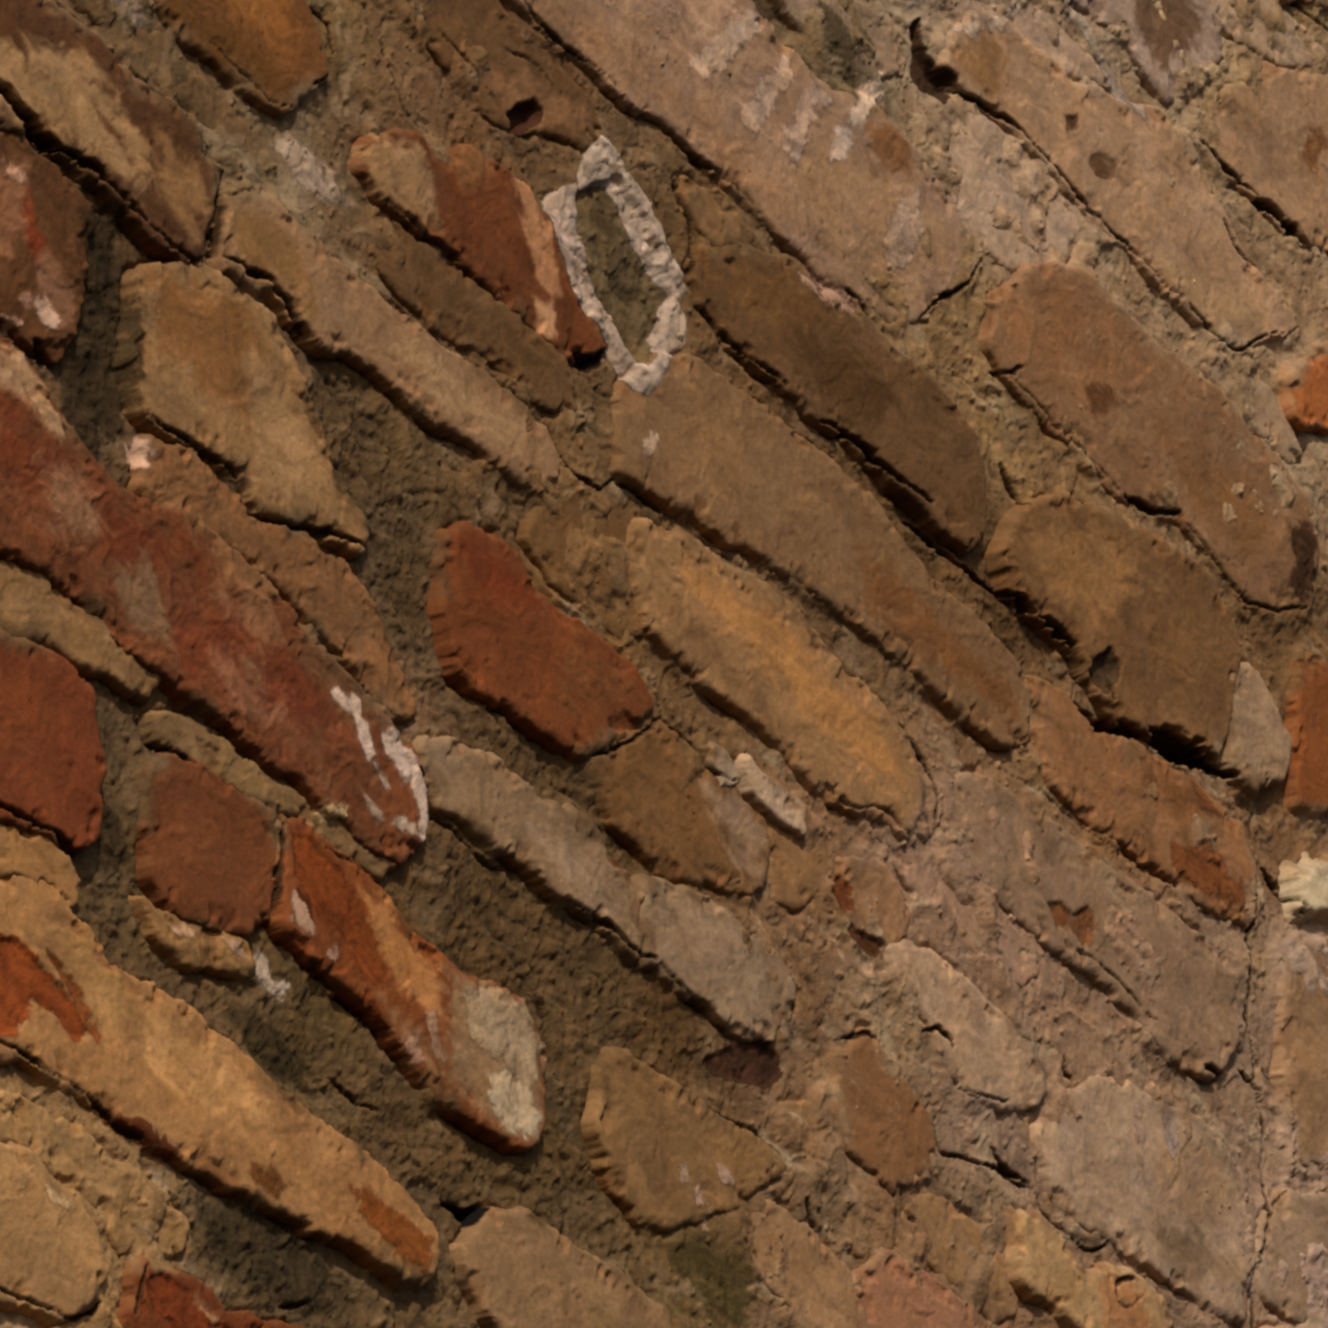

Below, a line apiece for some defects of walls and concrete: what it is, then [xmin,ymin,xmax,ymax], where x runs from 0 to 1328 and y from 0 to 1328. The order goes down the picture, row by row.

crack [1204,878,1300,1136]
crack [1245,1184,1279,1328]